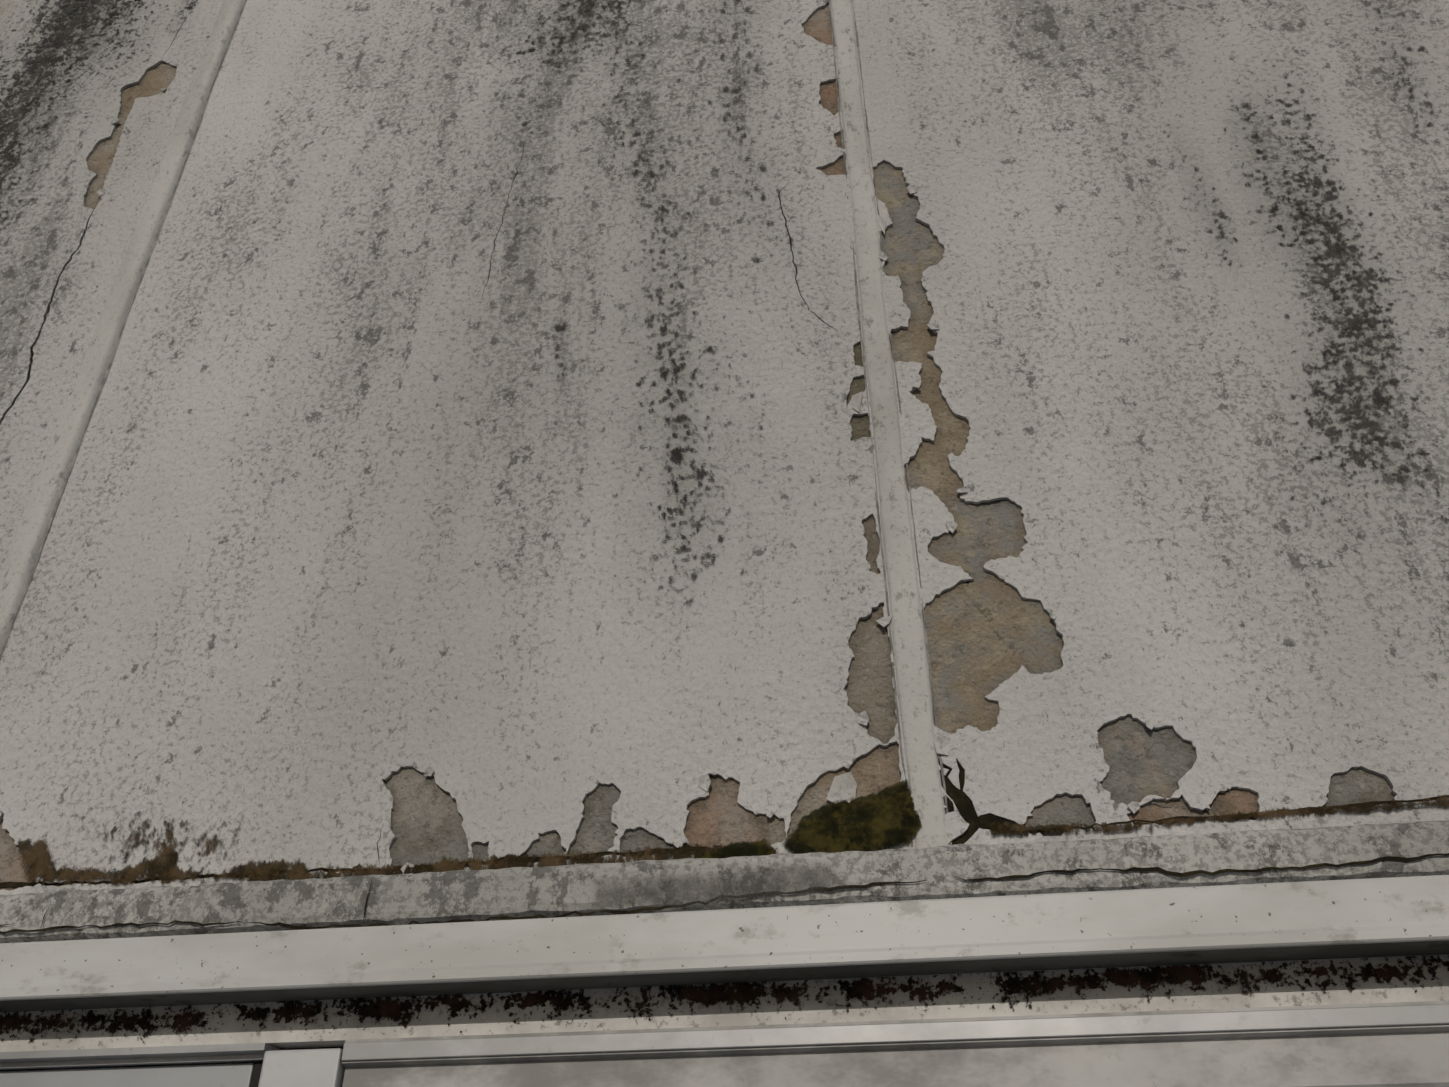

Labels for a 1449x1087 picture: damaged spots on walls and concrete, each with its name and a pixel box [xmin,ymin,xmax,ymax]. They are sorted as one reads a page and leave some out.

crack [0,208,95,424]
water stain [0,0,198,229]
peeling [85,62,177,209]
mould [486,0,772,607]
mould [701,0,803,265]
mould [1193,167,1244,266]
mould [1224,39,1449,534]
peeling [873,162,1064,756]
peeling [384,766,489,874]
peeling [524,604,901,863]
peeling [1024,794,1095,836]
peeling [1097,716,1258,826]